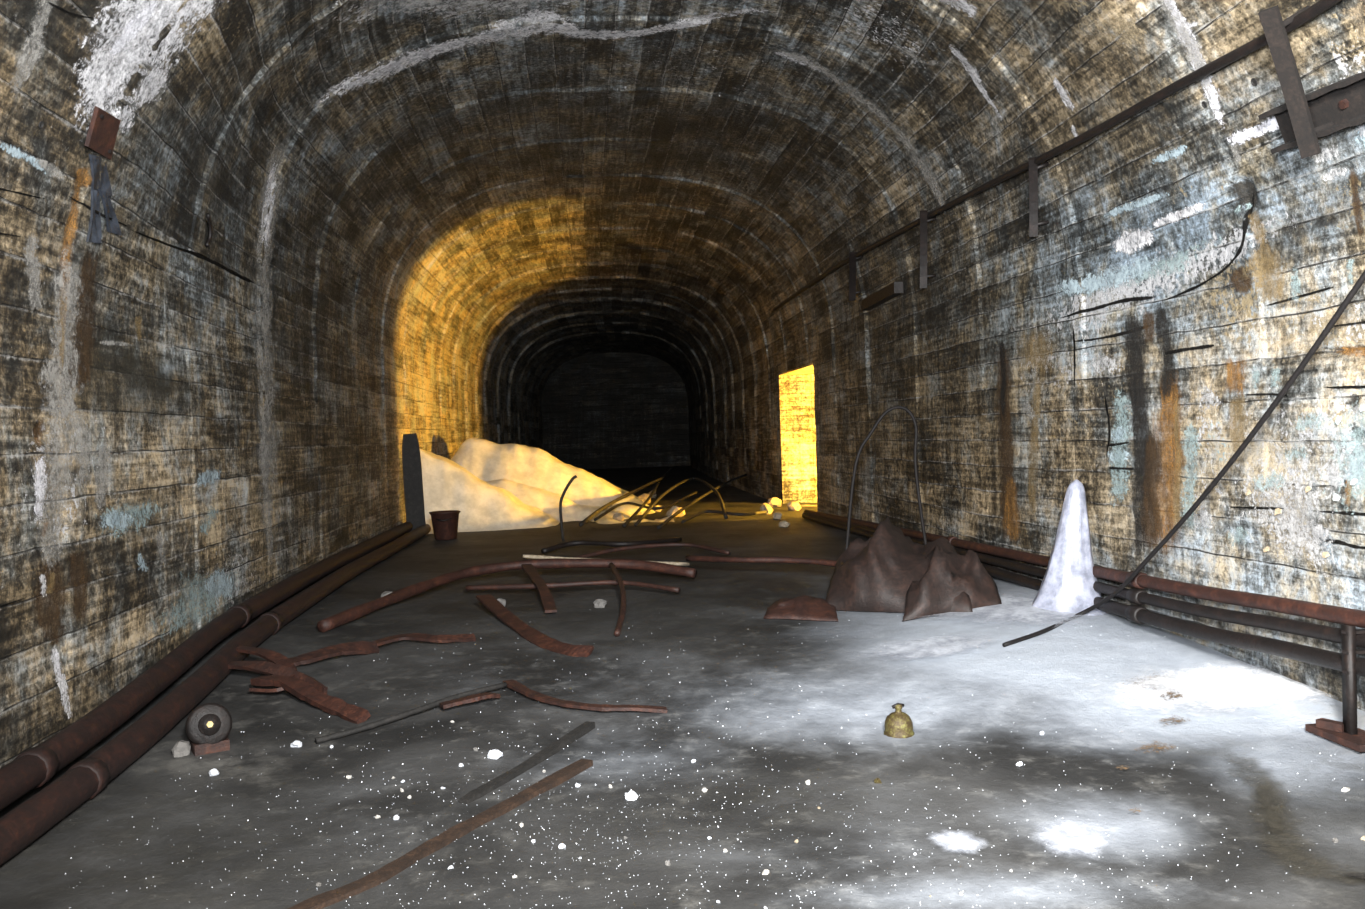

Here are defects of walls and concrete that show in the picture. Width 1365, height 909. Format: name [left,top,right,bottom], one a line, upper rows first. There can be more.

water stain [16,0,51,90]
water stain [70,0,229,132]
rust [1126,302,1183,553]